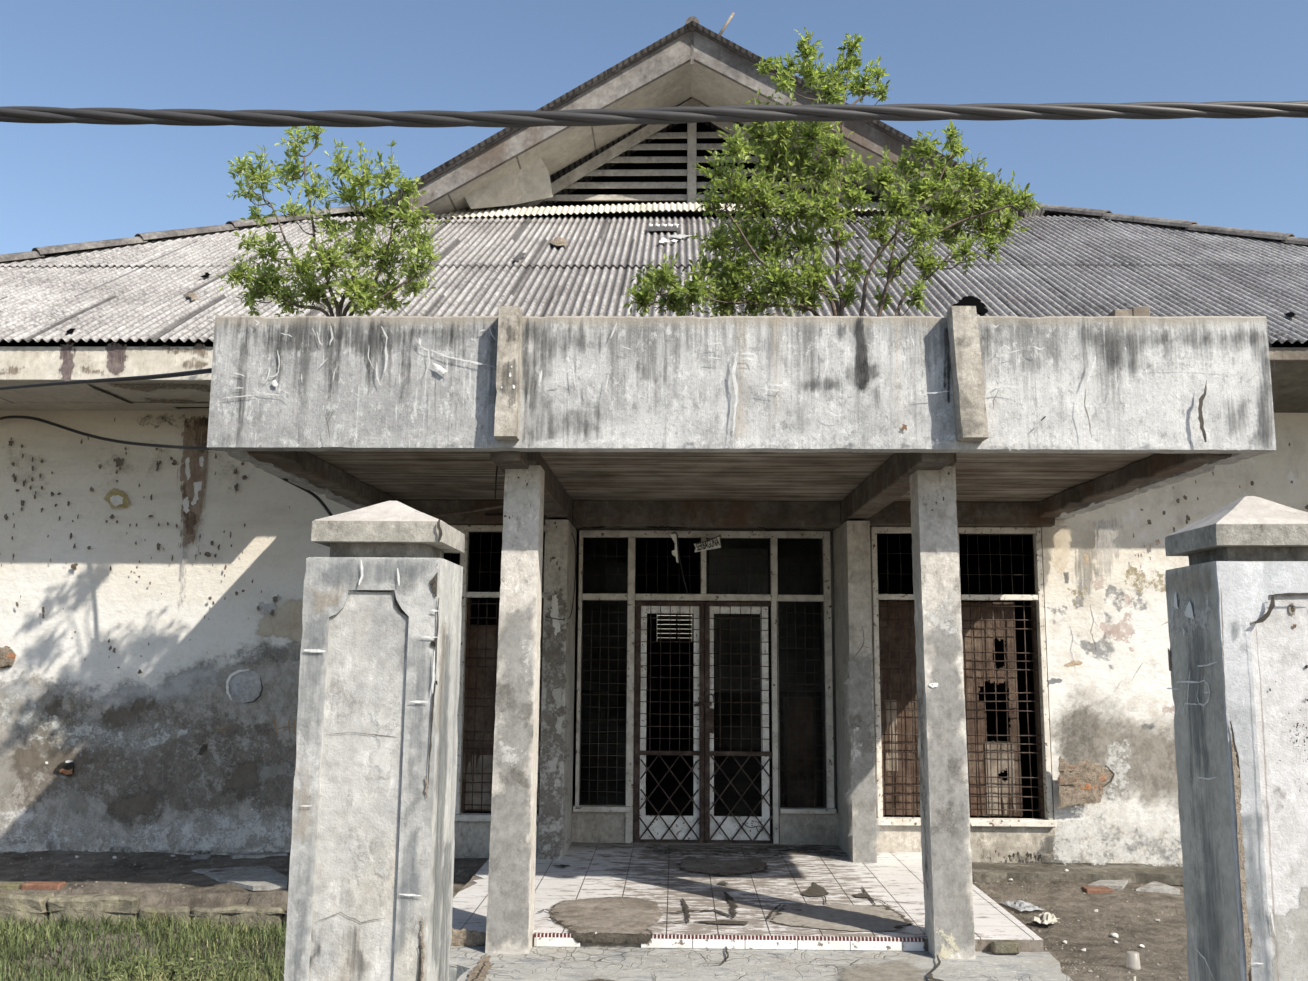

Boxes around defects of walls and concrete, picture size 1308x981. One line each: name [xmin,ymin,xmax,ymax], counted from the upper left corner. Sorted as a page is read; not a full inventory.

damp [226,331,292,421]
damp [368,326,609,401]
damp [689,342,758,445]
damp [808,316,880,399]
damp [917,328,980,444]
crack [1198,380,1207,442]
damp [1221,331,1273,448]
spalling [0,646,16,669]
damp [0,595,324,855]
damp [990,518,1214,867]
spalling [1057,755,1115,809]
crack [916,955,944,981]